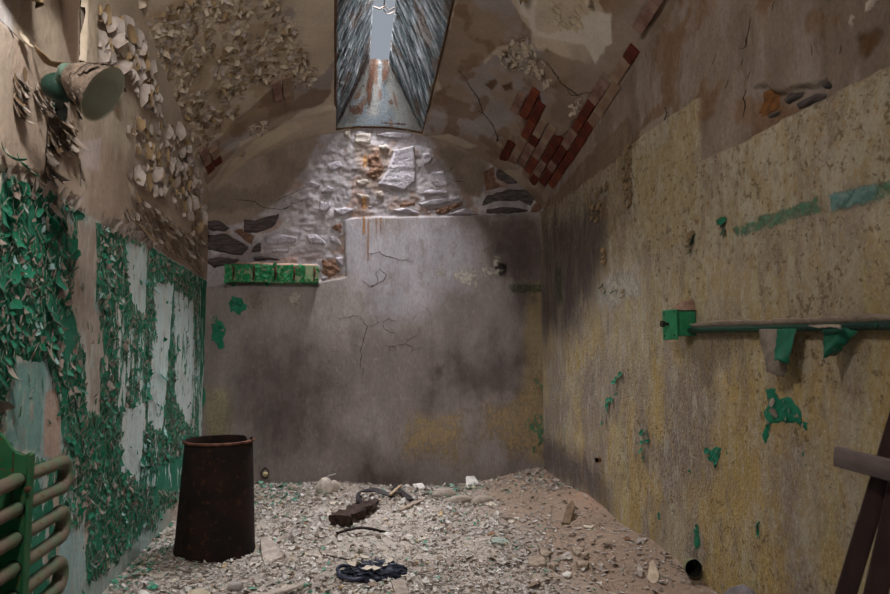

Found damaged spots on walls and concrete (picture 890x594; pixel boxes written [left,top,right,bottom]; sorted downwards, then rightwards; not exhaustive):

flaking render [495,37,640,189]
peeling [0,0,319,594]
rust [363,198,381,250]
crack [339,315,422,381]